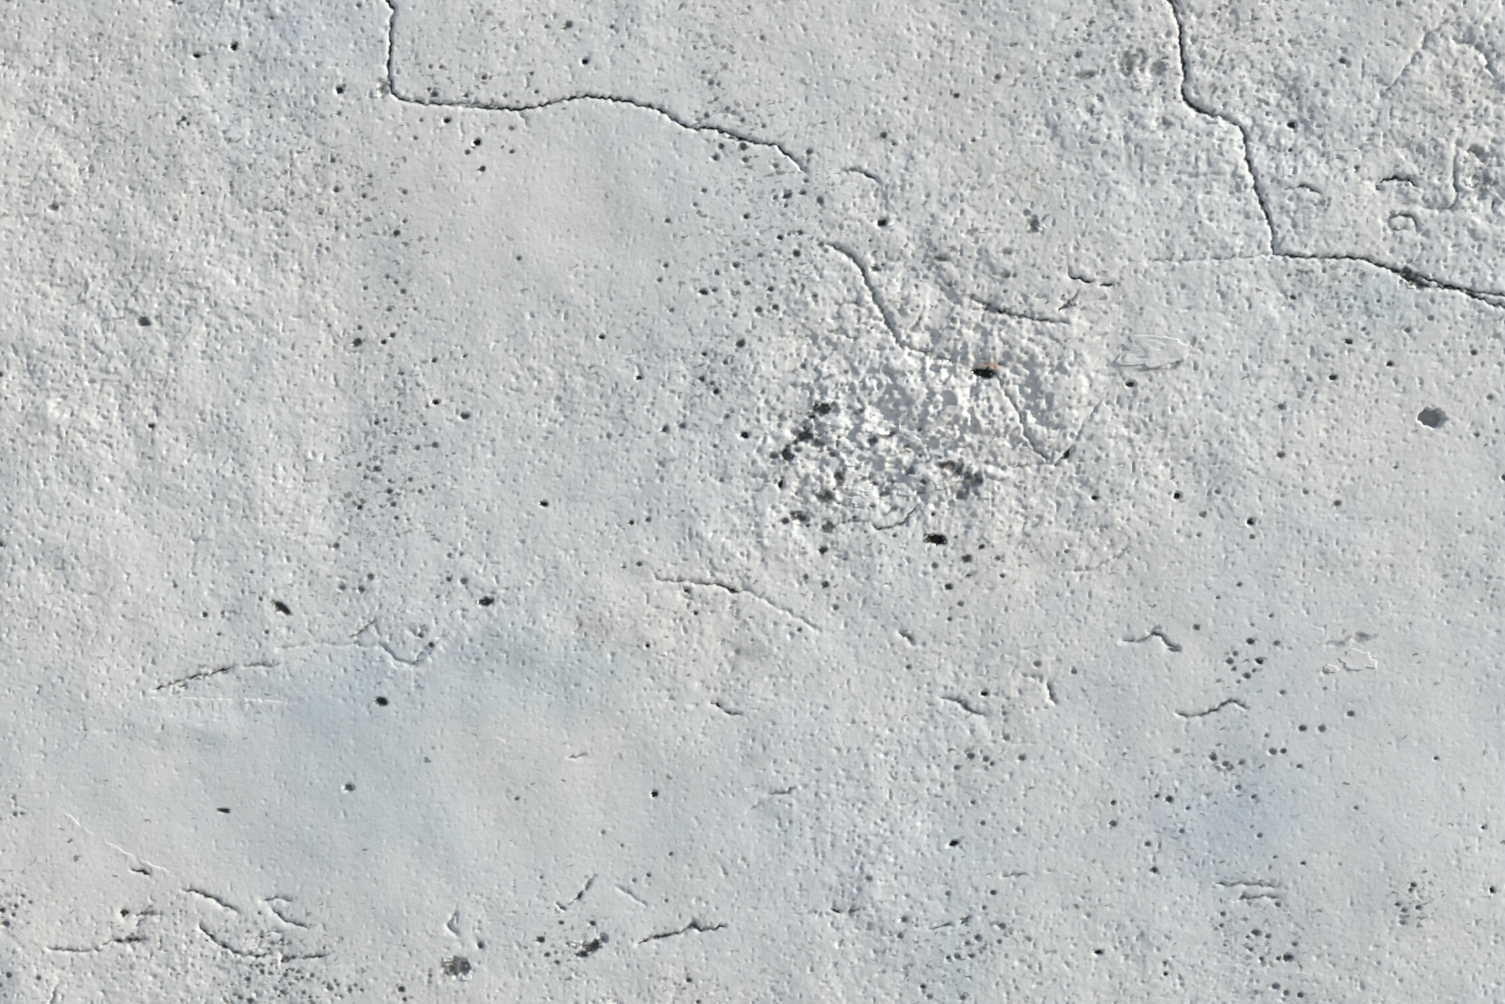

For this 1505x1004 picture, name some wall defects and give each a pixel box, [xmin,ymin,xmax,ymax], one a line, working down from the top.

crack [386,0,805,172]
crack [1168,0,1504,306]